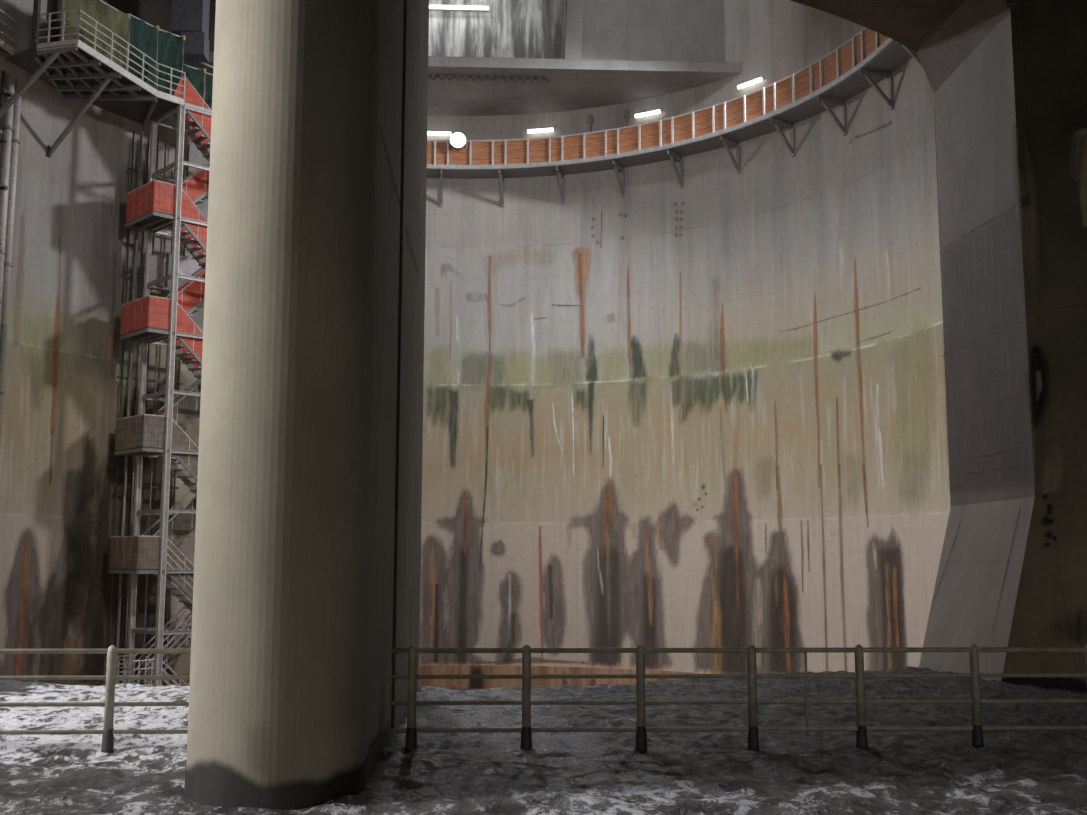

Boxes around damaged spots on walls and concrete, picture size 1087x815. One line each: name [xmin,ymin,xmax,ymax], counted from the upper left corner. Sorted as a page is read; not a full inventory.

water stain [1072,129,1087,227]
rust [574,248,590,347]
water stain [121,387,165,418]
rust [480,281,491,560]
water stain [0,441,170,684]
water stain [421,415,692,689]
water stain [696,469,804,674]
water stain [867,535,906,671]